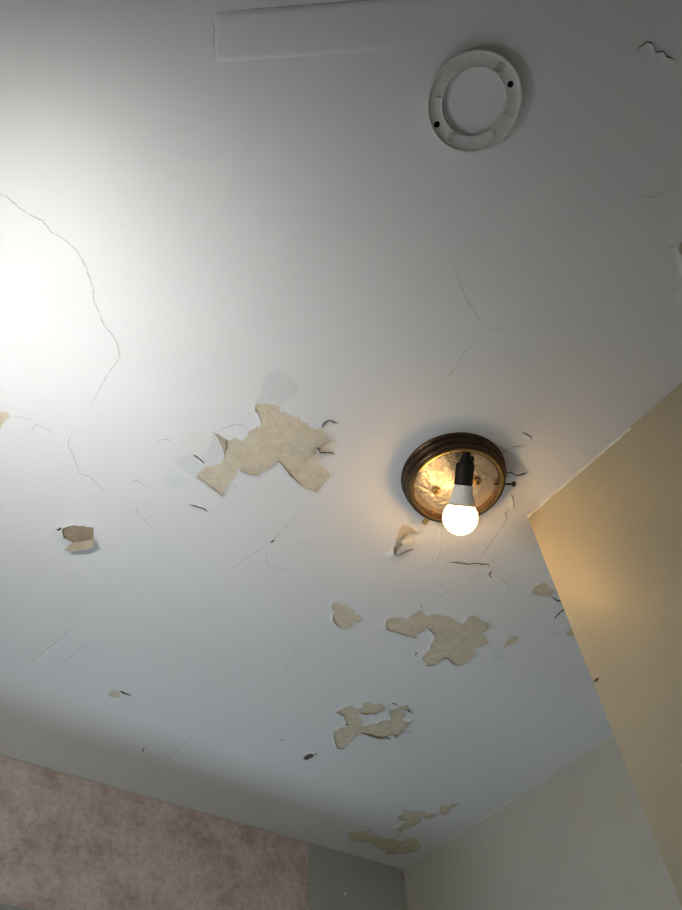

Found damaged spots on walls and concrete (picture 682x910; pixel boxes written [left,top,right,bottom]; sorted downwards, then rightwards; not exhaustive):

crack [634,41,677,64]
peeling [173,371,341,499]
spalling [50,514,106,552]
peeling [377,520,424,566]
crack [446,562,510,597]
peeling [527,579,562,604]
peeling [327,599,366,631]
peeling [381,606,523,668]
peeling [329,699,415,751]
peeling [344,801,463,855]